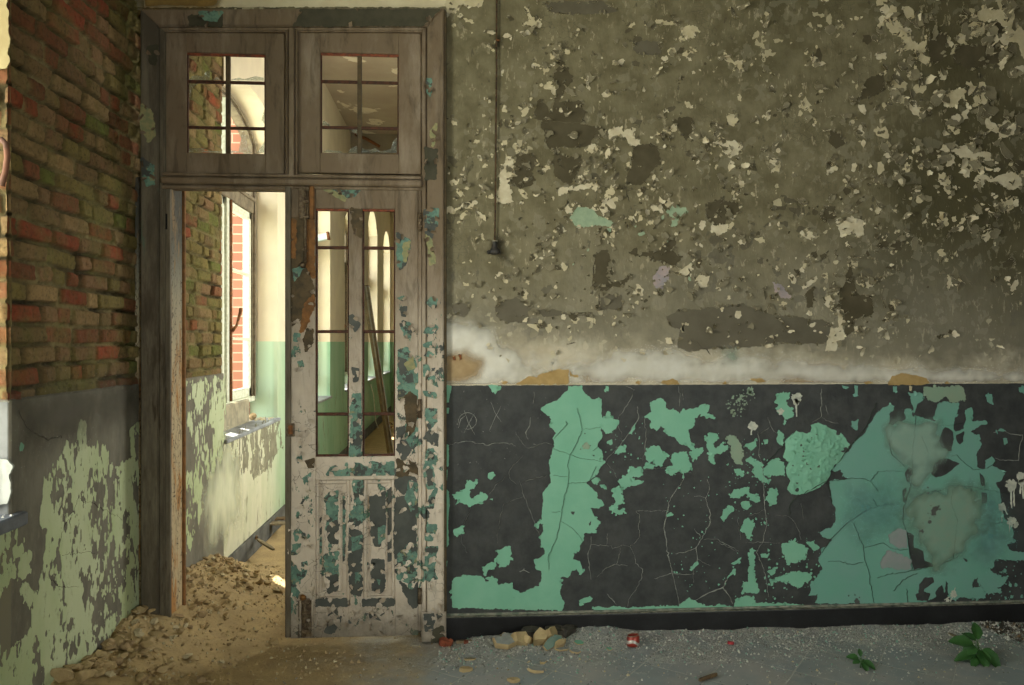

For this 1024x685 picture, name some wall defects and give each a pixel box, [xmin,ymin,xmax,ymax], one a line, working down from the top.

damp [447,324,533,383]
peeling [186,0,1024,643]
damp [568,352,993,382]
peeling [0,419,139,685]
crack [455,386,1023,604]
damp [885,420,983,572]